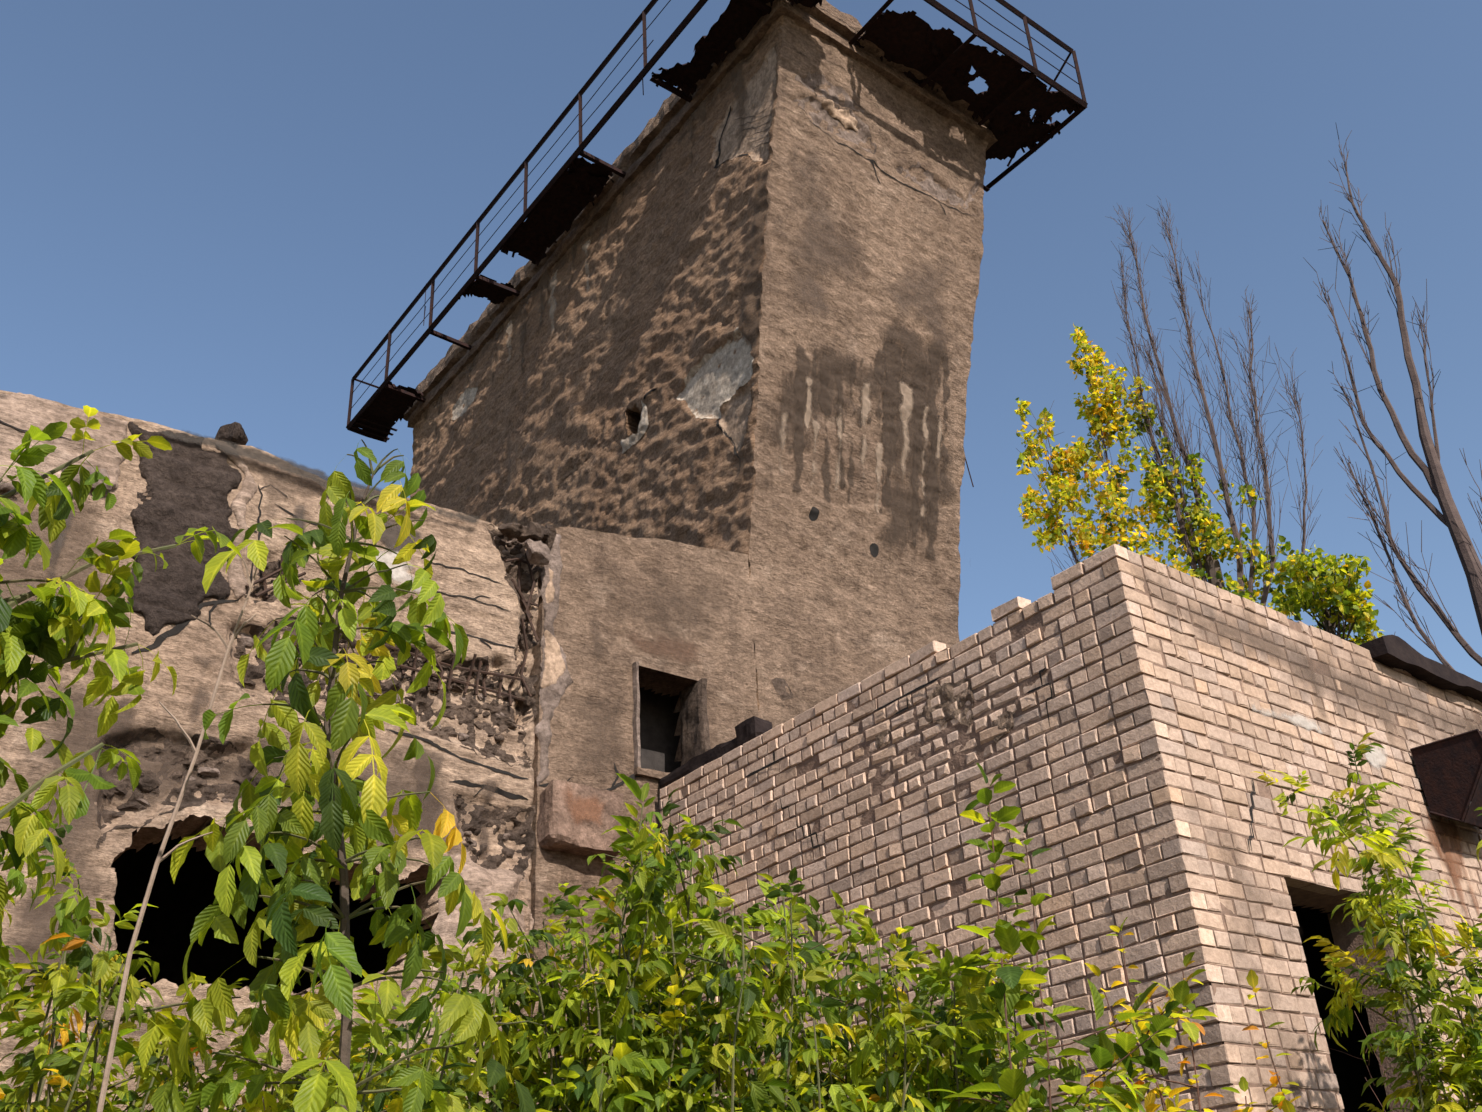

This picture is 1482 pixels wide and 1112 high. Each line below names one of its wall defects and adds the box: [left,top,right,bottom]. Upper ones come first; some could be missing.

peeling [452,387,478,420]
spalling [620,401,649,453]
peeling [677,327,755,452]
leakage [768,274,954,559]
peeling [0,392,573,786]
spalling [96,727,261,849]
spalling [453,794,536,879]